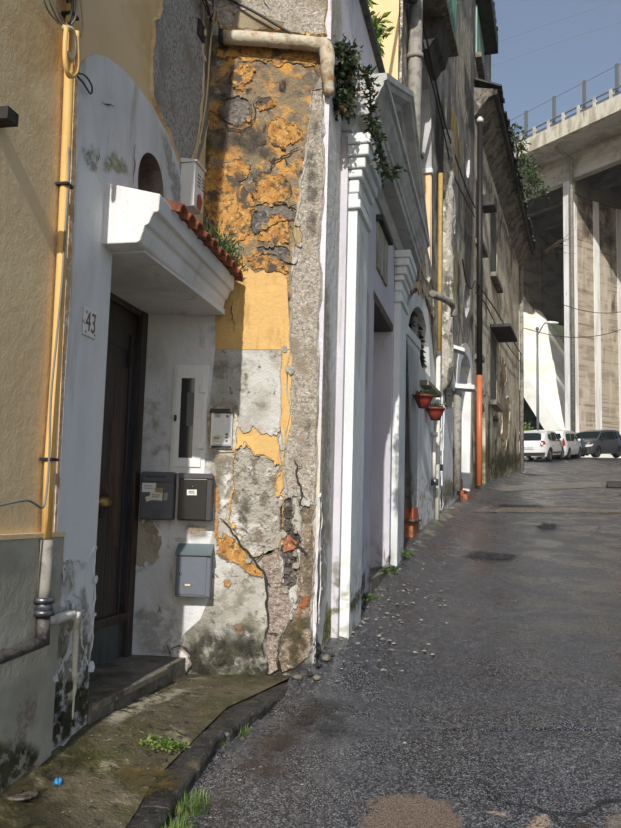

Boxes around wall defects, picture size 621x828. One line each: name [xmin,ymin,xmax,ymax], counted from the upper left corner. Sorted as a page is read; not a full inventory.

leakage [331,0,342,48]
spalling [149,0,328,675]
leakage [488,402,516,470]
spalling [53,545,98,682]
peeling [135,519,163,587]
crack [220,518,280,659]